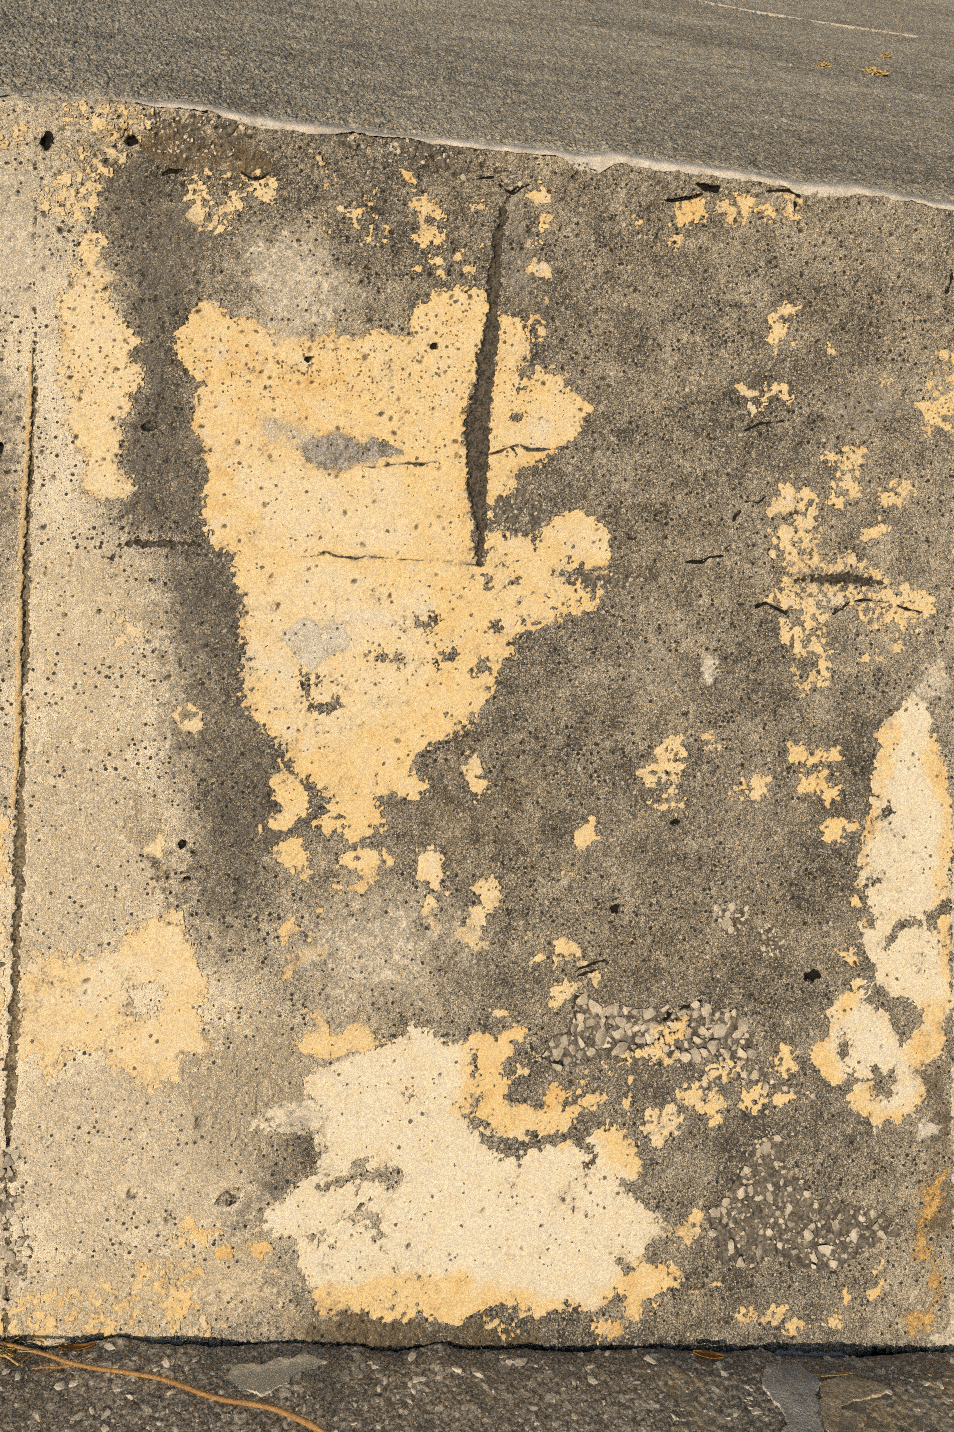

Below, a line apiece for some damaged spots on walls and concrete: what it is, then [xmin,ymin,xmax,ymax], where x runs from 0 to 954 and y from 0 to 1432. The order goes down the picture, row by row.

crack [327,552,405,560]
peeling [172,128,637,895]
crack [463,144,571,567]
peeling [763,440,937,698]
peeling [0,691,954,1432]